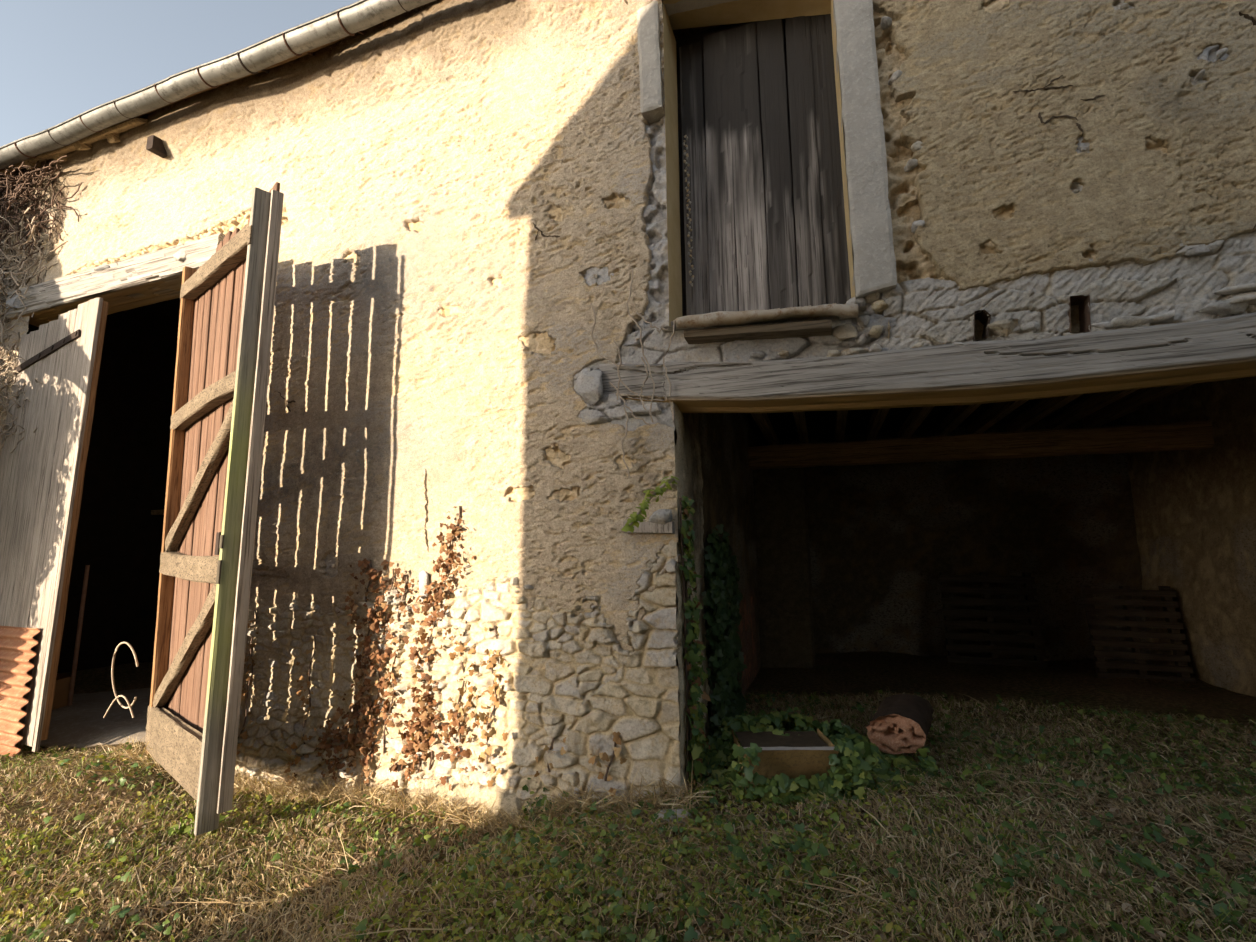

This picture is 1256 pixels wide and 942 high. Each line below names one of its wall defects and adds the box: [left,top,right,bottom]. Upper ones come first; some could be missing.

crack [1239,12,1256,26]
peeling [573,232,1256,431]